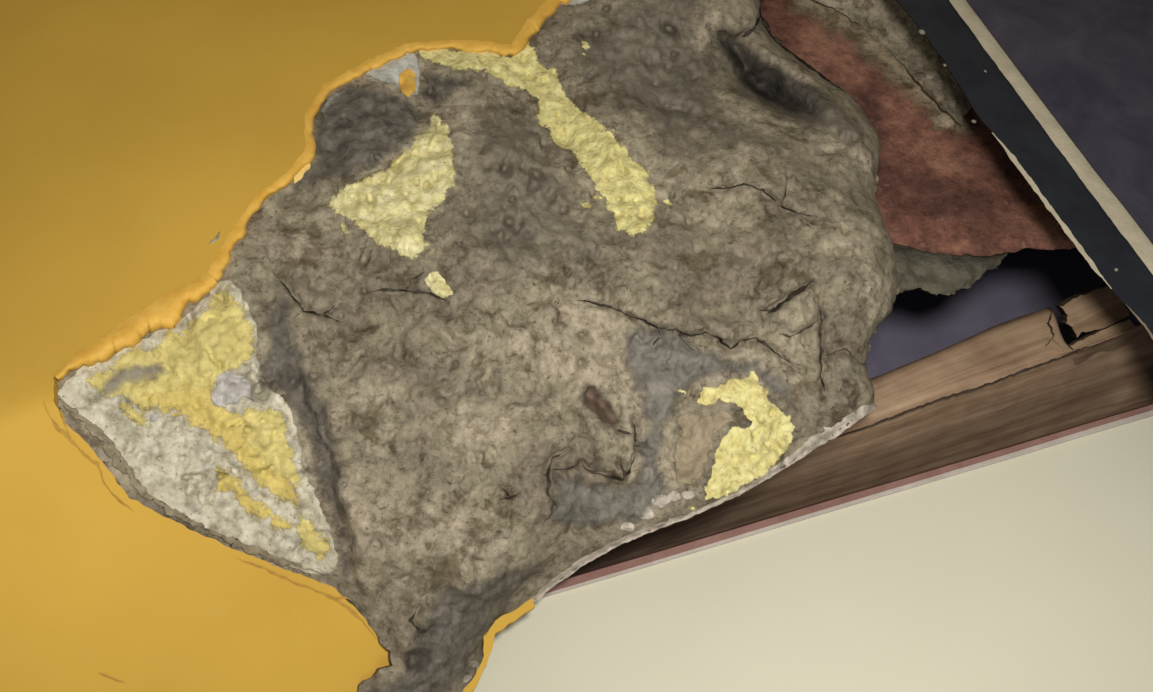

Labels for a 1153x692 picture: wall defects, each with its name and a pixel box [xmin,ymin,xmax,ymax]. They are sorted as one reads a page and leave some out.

flaking render [814,0,976,126]
crack [704,183,818,217]
crack [280,280,341,323]
crack [371,271,445,301]
flaking render [54,0,899,692]
crack [562,281,867,391]
spalling [865,132,1112,379]
spalling [1120,306,1153,339]
crack [539,417,645,526]